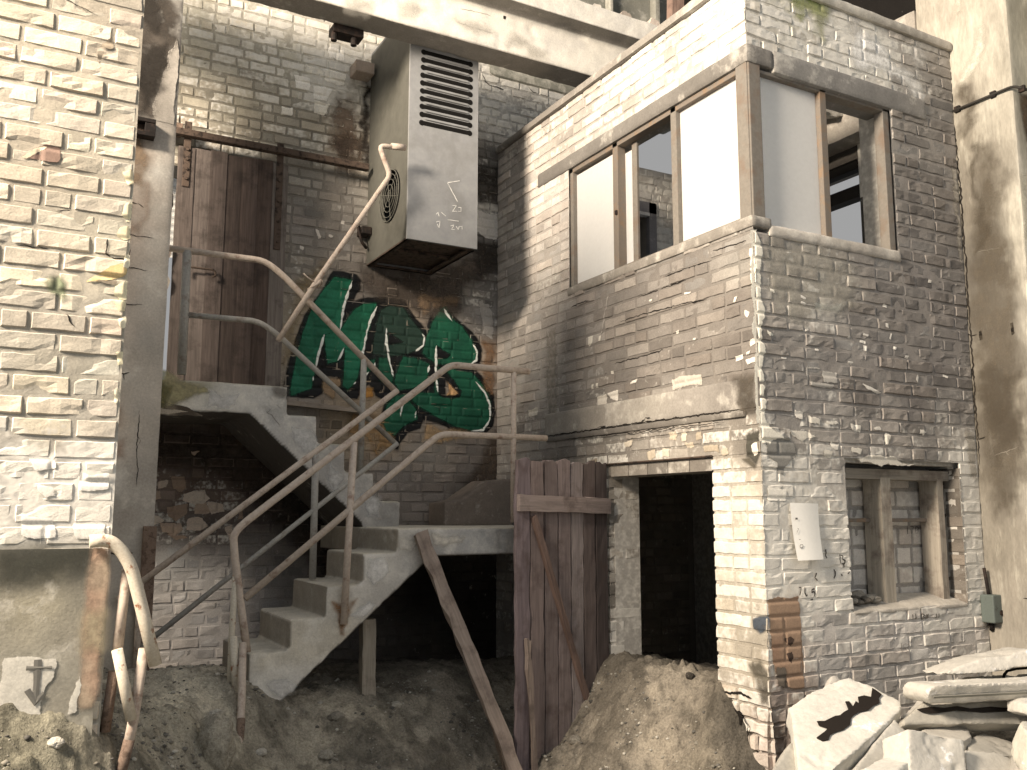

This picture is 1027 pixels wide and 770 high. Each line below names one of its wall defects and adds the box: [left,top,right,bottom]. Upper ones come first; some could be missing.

spalling [22,144,60,162]
peeling [123,170,134,185]
peeling [117,203,132,240]
peeling [87,254,130,328]
peeling [733,229,861,456]
water stain [971,156,1027,504]
peeling [824,426,914,466]
peeling [154,476,225,540]